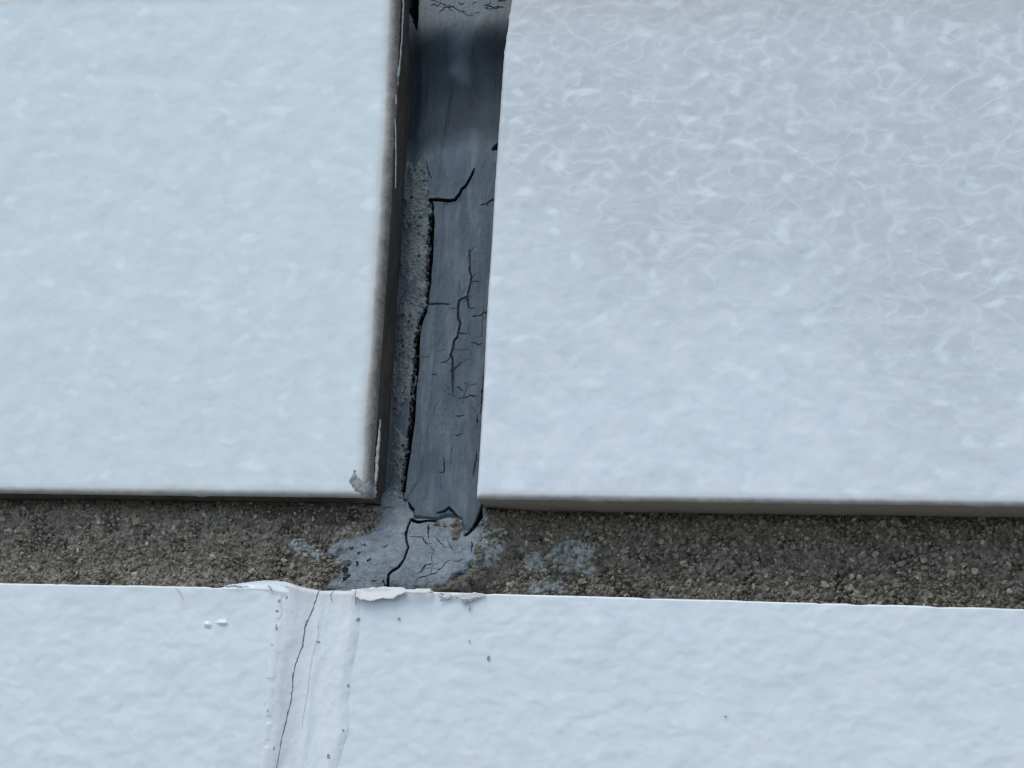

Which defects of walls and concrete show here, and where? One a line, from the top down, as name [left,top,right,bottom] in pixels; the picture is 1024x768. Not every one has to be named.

crack [371,162,494,587]
peeling [221,580,289,612]
crack [276,589,320,768]
peeling [355,586,486,612]